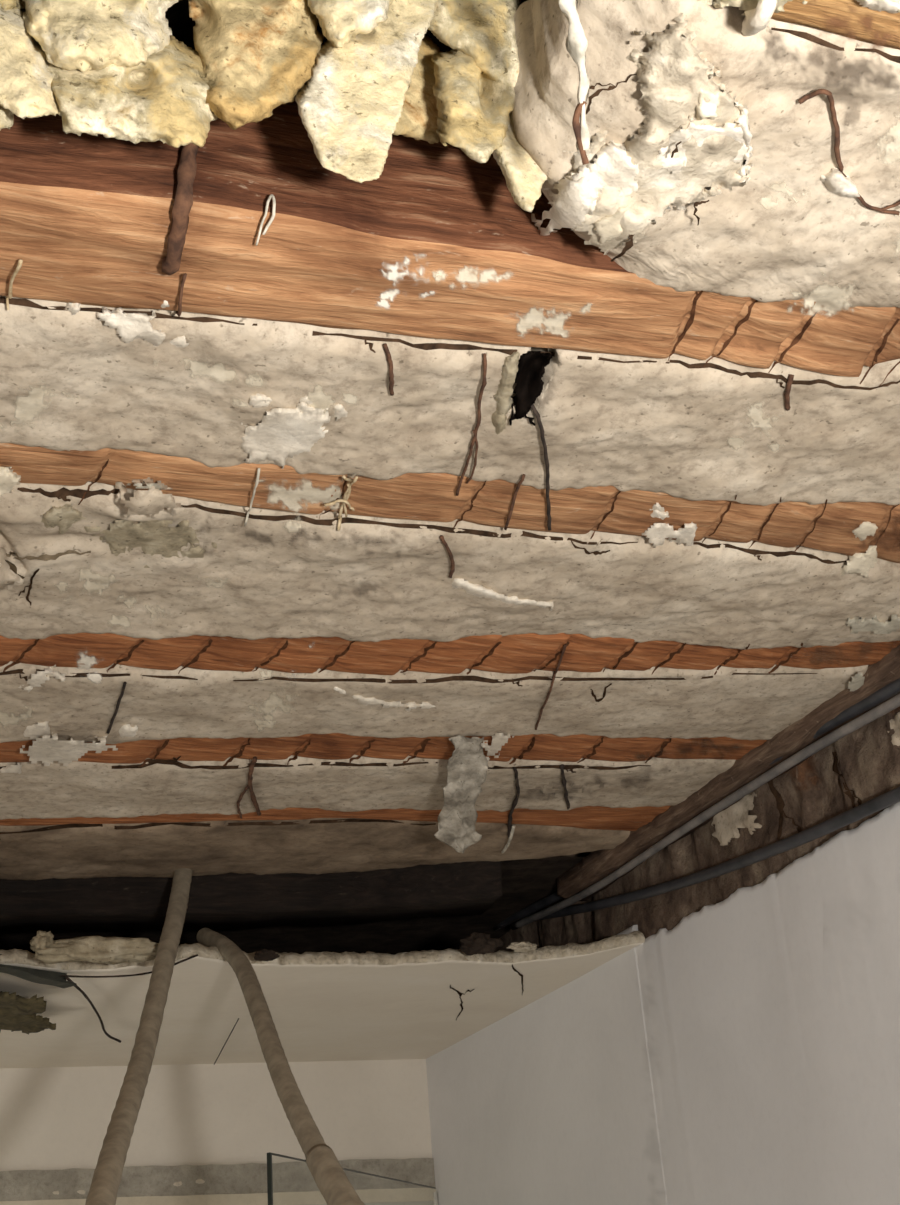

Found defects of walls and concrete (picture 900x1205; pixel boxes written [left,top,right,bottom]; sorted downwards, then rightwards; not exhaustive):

peeling [698,0,759,16]
peeling [531,13,754,262]
peeling [96,300,189,347]
peeling [378,289,399,308]
hole [491,351,553,435]
peeling [233,373,357,469]
spalling [41,504,217,568]
peeling [642,503,697,548]
peeling [841,522,878,578]
peeling [0,721,138,774]
crack [450,985,474,1020]
crack [512,961,524,993]